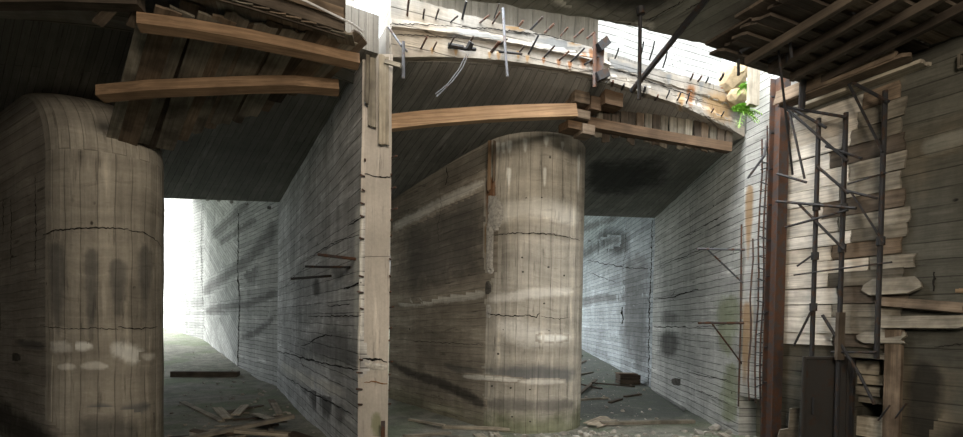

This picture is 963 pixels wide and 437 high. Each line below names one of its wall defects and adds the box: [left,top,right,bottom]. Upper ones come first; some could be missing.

corrosion [487,50,502,62]
corrosion [505,26,540,36]
corrosion [516,42,593,71]
damp [13,239,156,372]
crack [35,178,160,272]
crack [284,217,362,288]
crack [278,282,387,415]
crack [490,204,733,384]